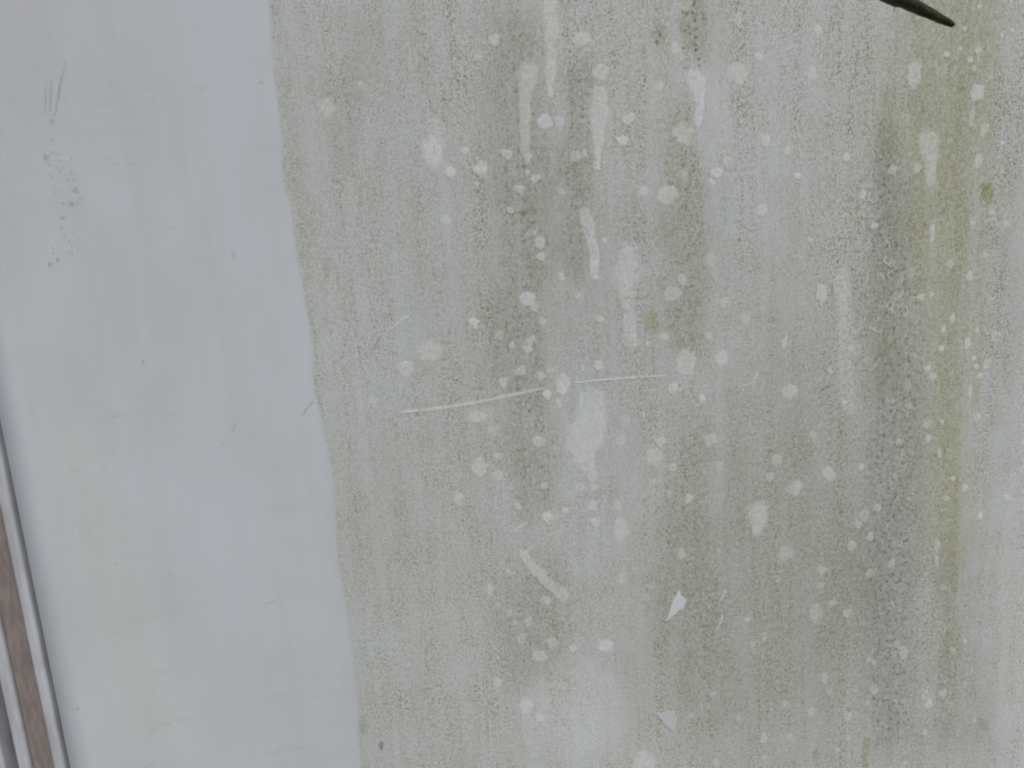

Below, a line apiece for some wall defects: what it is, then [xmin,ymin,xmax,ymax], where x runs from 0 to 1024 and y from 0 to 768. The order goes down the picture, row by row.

damp [816,59,926,524]